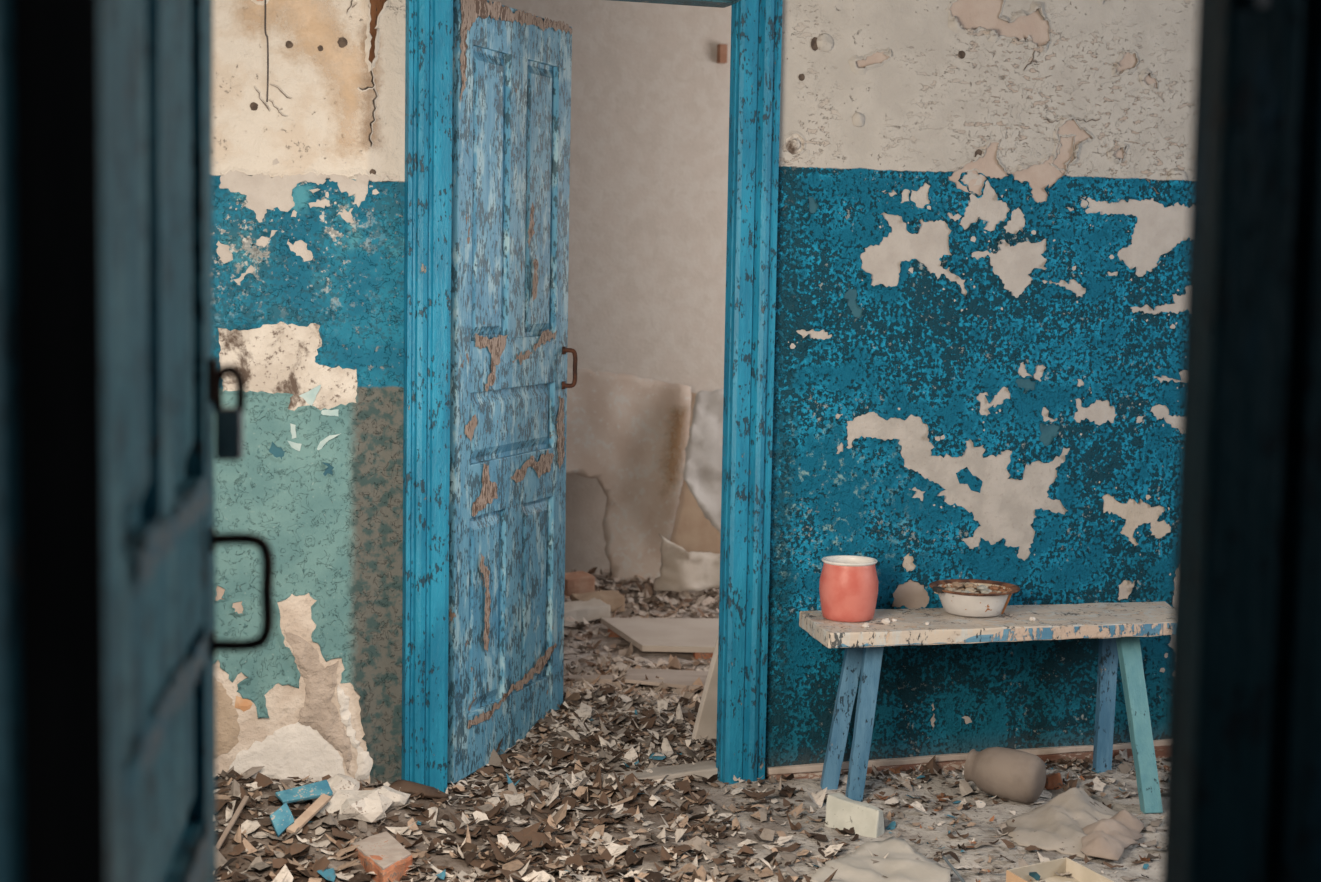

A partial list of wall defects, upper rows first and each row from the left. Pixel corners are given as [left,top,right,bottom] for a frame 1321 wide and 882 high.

crack [357,69,379,147]
spalling [783,130,807,158]
peeling [849,47,892,75]
peeling [945,0,1051,54]
peeling [1111,49,1159,91]
peeling [212,158,401,289]
peeling [840,114,1190,329]
peeling [788,324,835,349]
peeling [213,318,362,479]
peeling [831,357,1183,564]
peeling [215,582,247,618]
spalling [216,590,377,784]